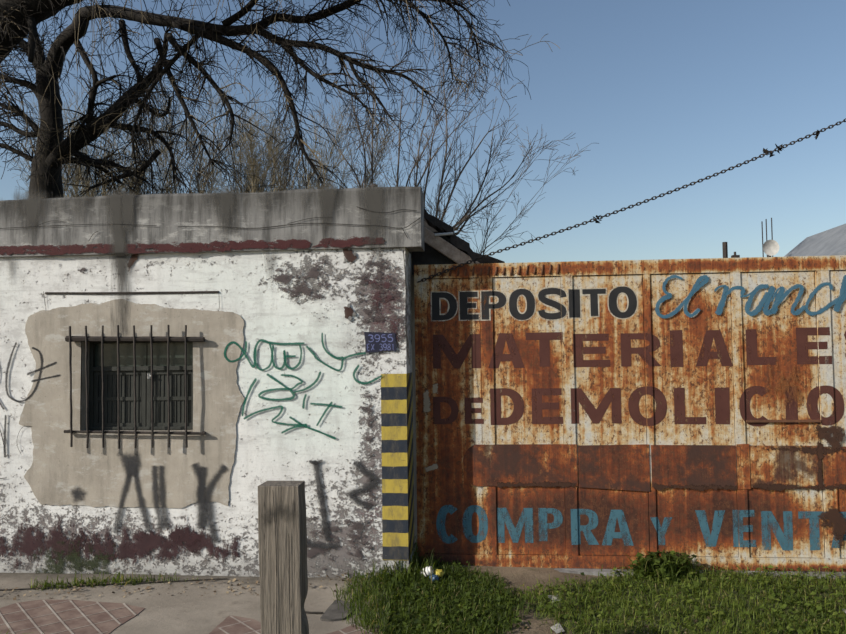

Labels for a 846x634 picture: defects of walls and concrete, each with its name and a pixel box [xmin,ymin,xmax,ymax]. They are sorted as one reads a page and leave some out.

water stain [14,192,46,233]
water stain [213,187,239,233]
peeling [0,243,113,256]
water stain [106,190,134,329]
peeling [125,236,406,354]
flaking render [19,299,245,508]
peeling [0,515,246,570]